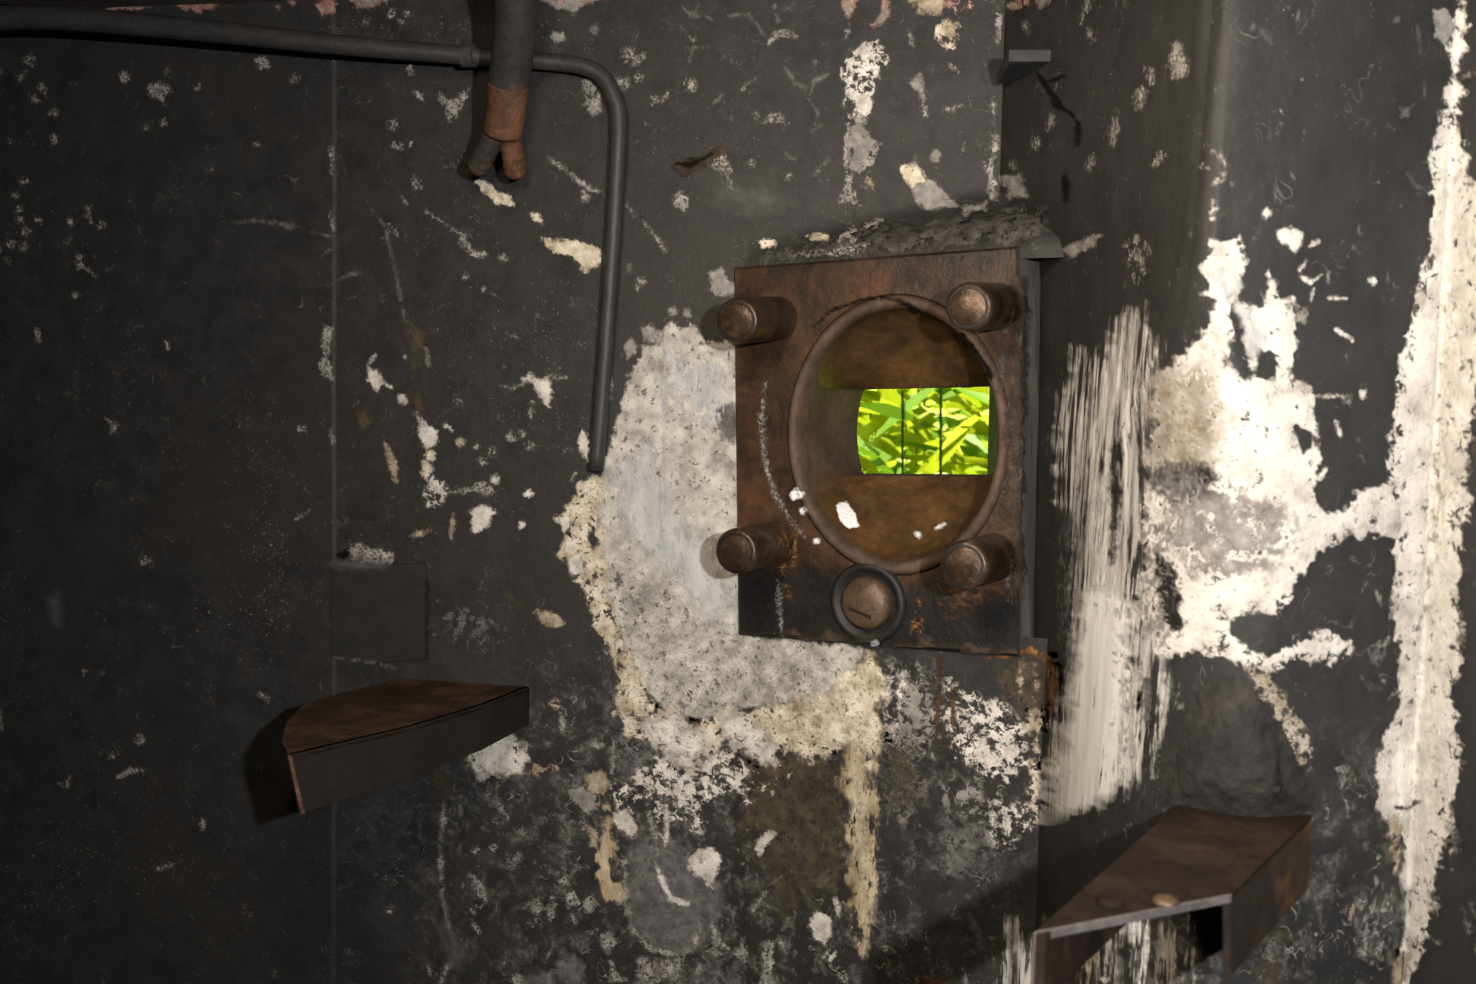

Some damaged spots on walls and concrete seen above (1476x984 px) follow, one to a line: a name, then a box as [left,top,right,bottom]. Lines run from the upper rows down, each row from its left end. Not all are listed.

peeling [547,157,602,203]
peeling [1200,150,1227,221]
peeling [1137,208,1401,771]
corrosion [939,575,1007,620]
peeling [469,307,891,984]
peeling [1334,765,1356,791]